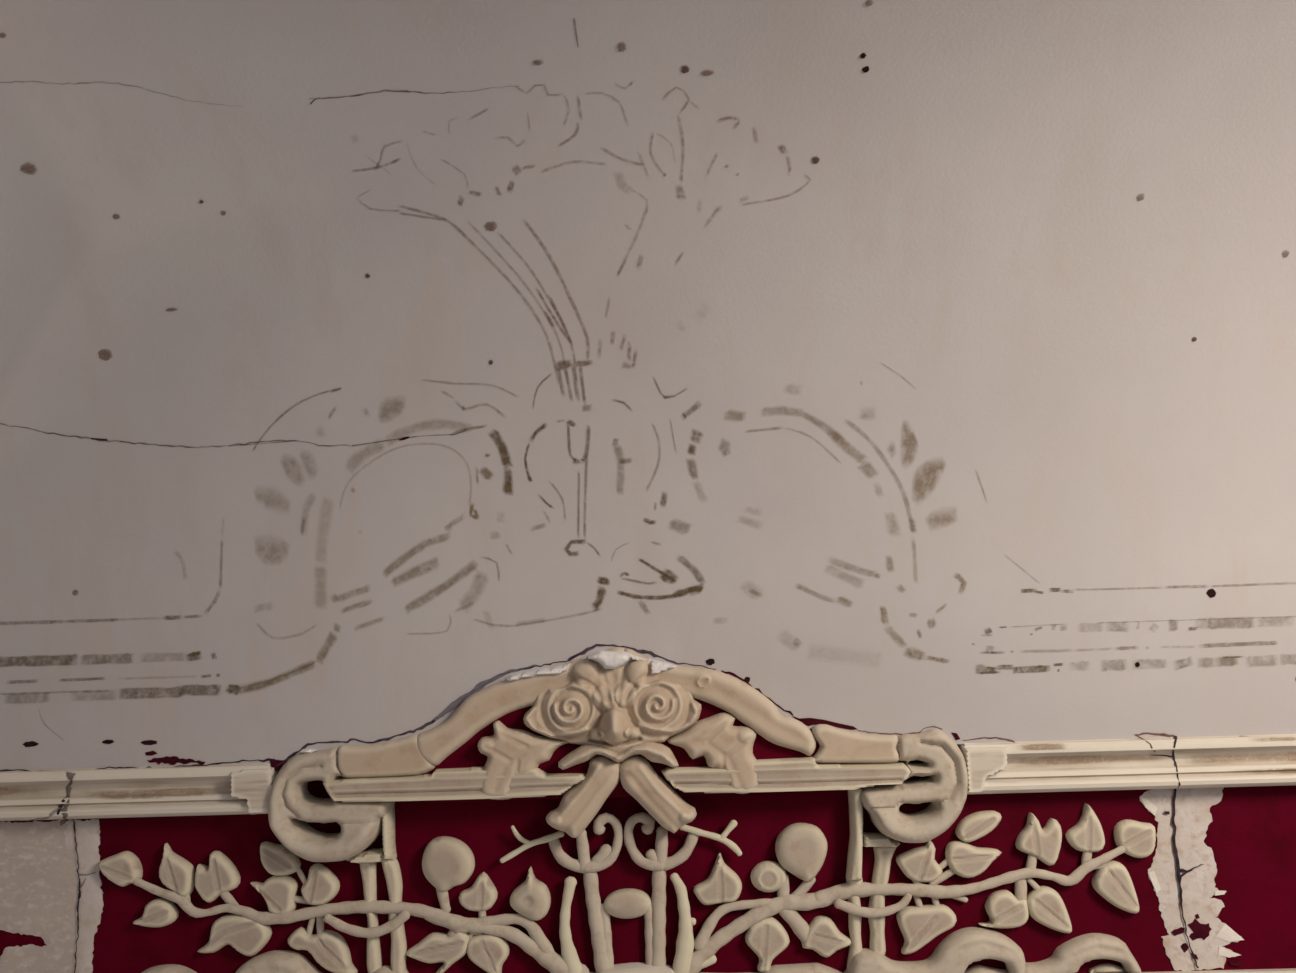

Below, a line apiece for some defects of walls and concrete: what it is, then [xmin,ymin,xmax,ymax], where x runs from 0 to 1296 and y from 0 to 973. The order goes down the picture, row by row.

crack [0,423,465,448]
peeling [0,819,104,973]
crack [0,644,1015,973]
crack [1135,732,1204,969]
peeling [1139,787,1244,971]